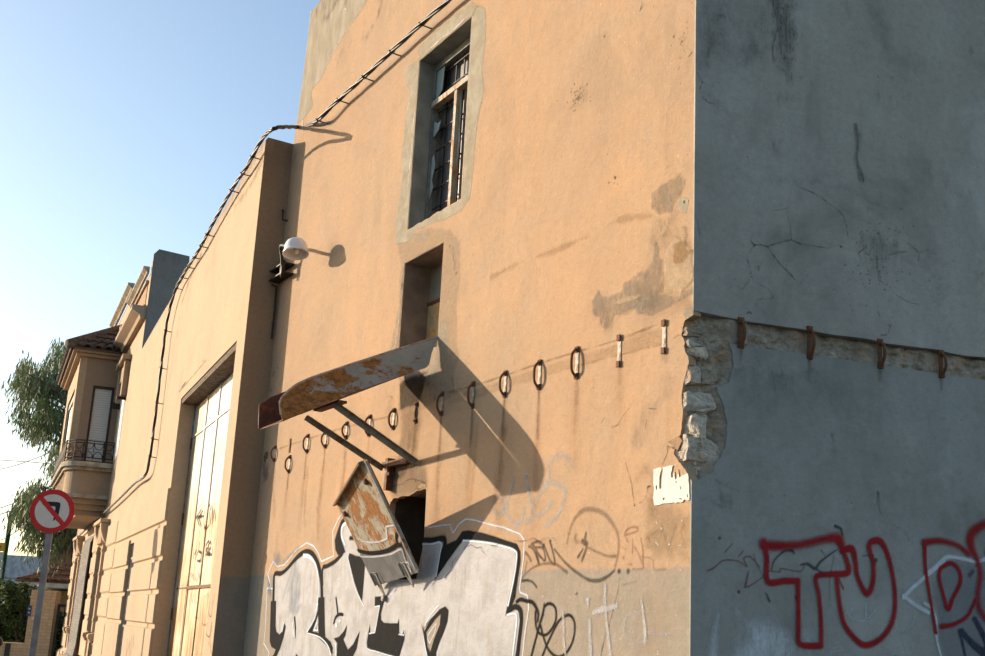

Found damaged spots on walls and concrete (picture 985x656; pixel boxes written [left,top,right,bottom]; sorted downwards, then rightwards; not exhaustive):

water stain [593,228,693,328]
spalling [675,315,985,479]